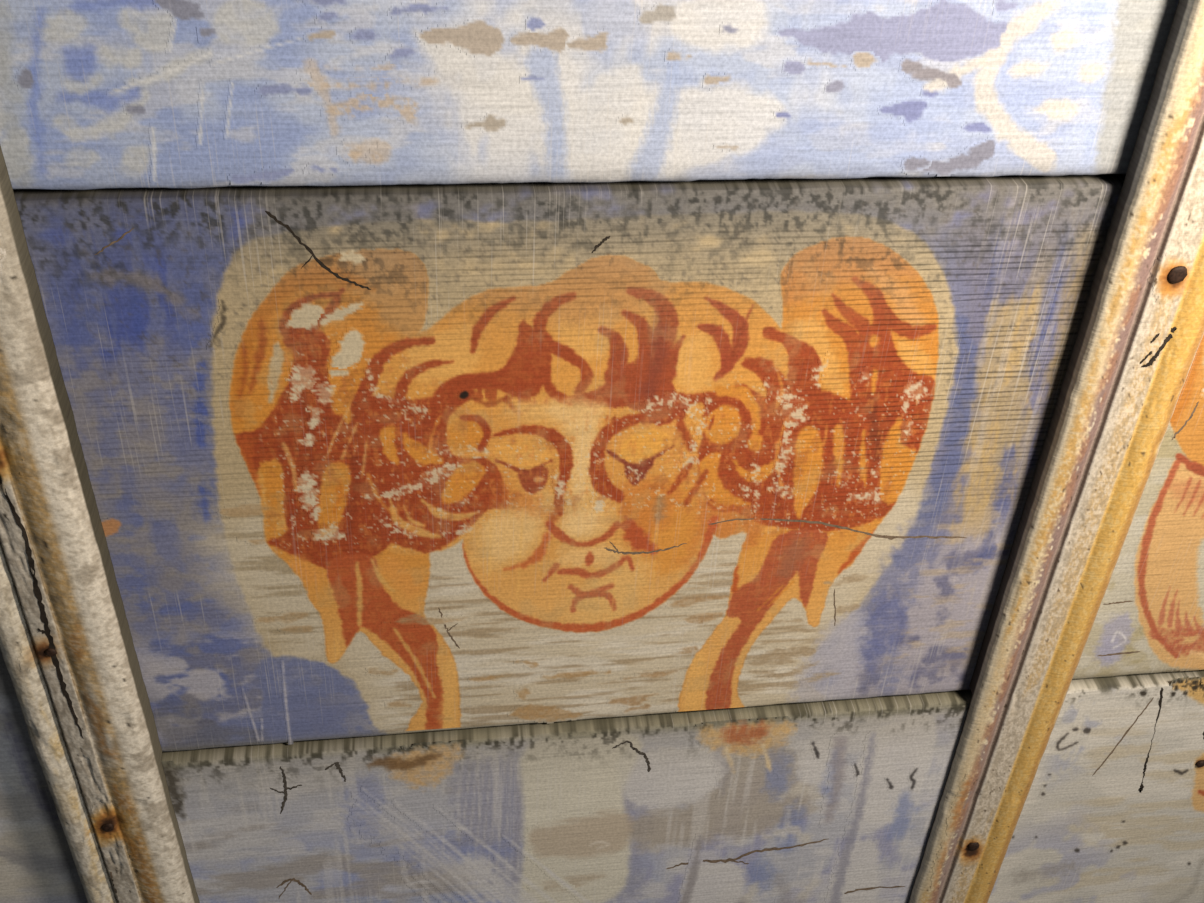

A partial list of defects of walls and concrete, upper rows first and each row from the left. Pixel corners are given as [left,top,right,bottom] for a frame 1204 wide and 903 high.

peeling [773,0,1020,126]
crack [265,211,371,290]
corrosion [1147,251,1198,305]
peeling [284,300,429,447]
corrosion [0,425,27,495]
peeling [738,351,831,522]
peeling [291,465,351,546]
crack [0,476,83,738]
corrosion [18,630,67,673]
crack [1092,688,1164,793]
corrosion [80,800,141,859]
crack [667,839,827,869]